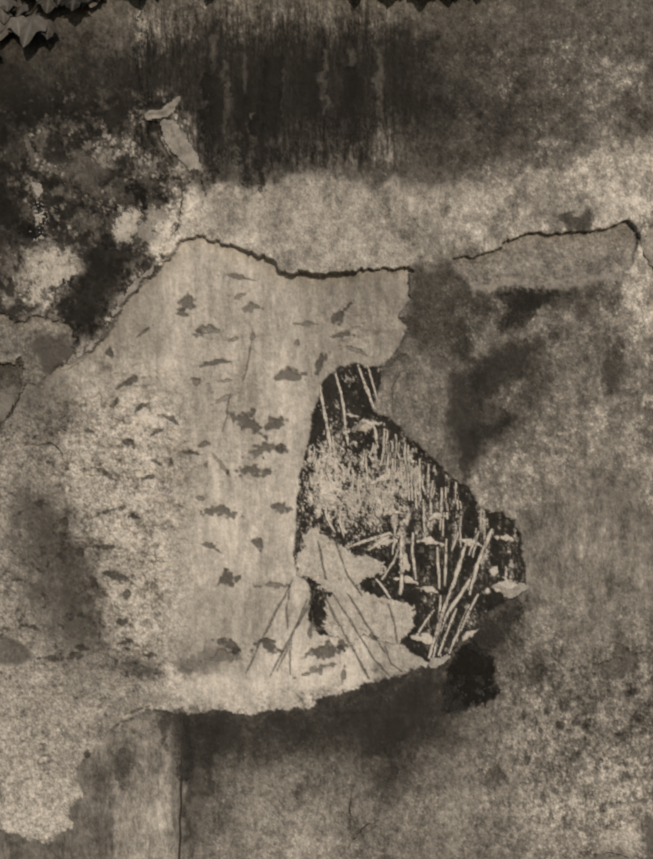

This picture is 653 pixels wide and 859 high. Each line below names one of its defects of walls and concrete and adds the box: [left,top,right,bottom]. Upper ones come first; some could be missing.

leakage [48,2,457,195]
crack [165,174,190,242]
crack [630,220,653,270]
leakage [447,285,559,471]
flaking render [0,235,530,845]
crack [342,794,375,849]